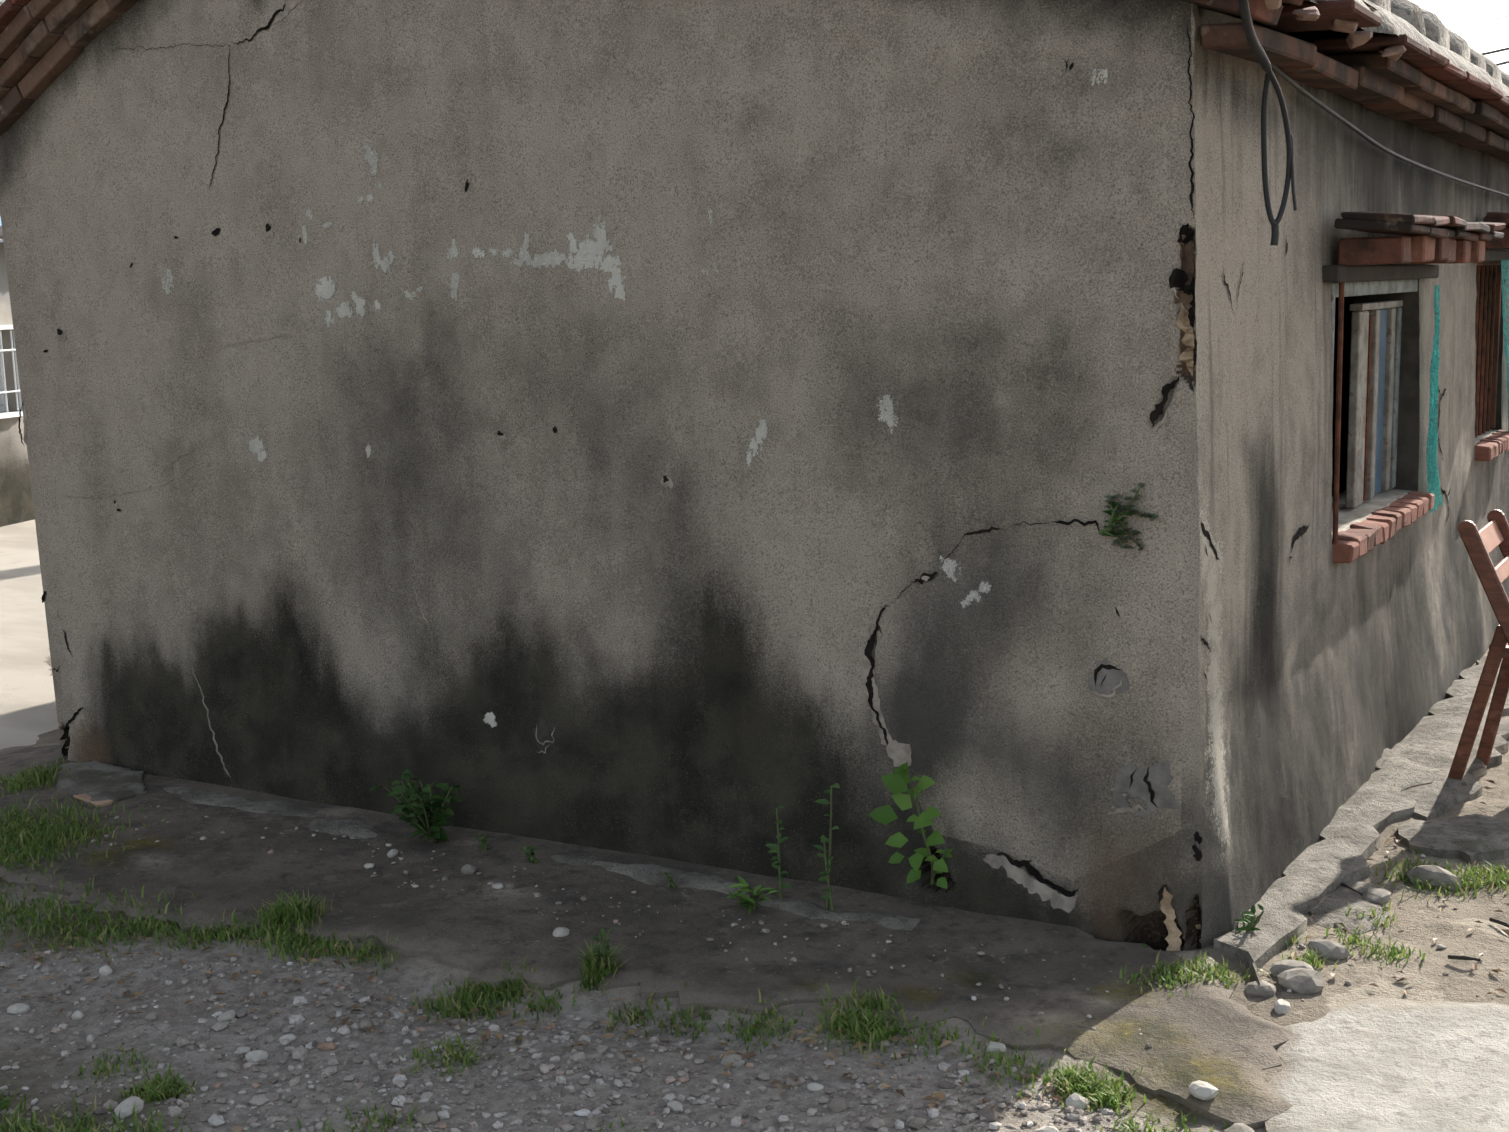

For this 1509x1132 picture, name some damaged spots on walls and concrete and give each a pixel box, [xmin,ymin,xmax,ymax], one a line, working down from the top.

crack [112,0,301,189]
crack [1187,24,1195,216]
peeling [446,212,626,301]
spalling [1148,223,1197,431]
crack [53,609,73,672]
crack [63,707,87,756]
water stain [100,582,926,900]
water stain [871,534,1042,784]
crack [861,519,1100,767]
water stain [1245,453,1423,901]
water stain [954,849,1116,941]
spalling [1117,884,1202,951]